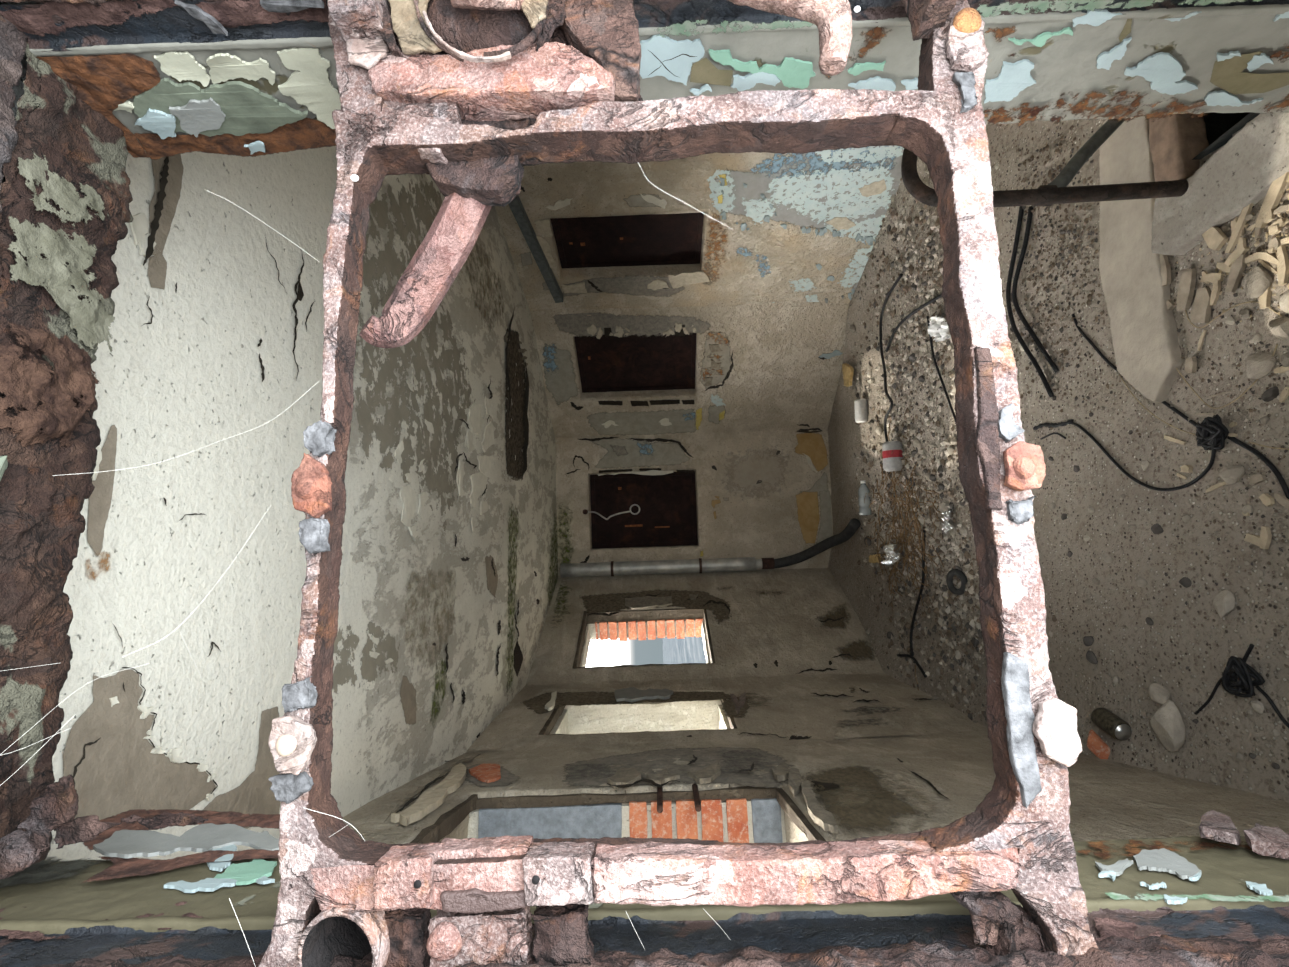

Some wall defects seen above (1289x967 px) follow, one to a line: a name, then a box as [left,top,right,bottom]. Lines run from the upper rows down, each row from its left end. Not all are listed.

peeling [114,48,341,155]
corrosion [984,91,1208,127]
peeling [976,0,1289,107]
corrosion [1264,94,1289,113]
spalling [130,153,183,289]
corrosion [703,213,729,284]
peeling [707,145,904,303]
crack [142,283,177,326]
crack [257,339,265,382]
crack [266,243,315,381]
corrosion [700,332,734,391]
peeling [63,667,281,893]